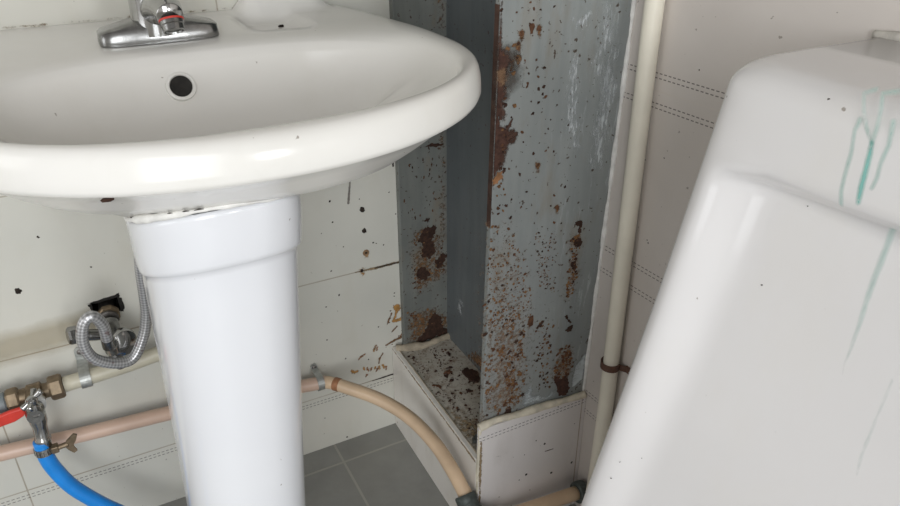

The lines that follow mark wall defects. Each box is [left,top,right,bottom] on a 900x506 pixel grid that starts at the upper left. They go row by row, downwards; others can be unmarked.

rust [403,181,447,292]
rust [462,1,583,417]
rust [351,304,482,503]